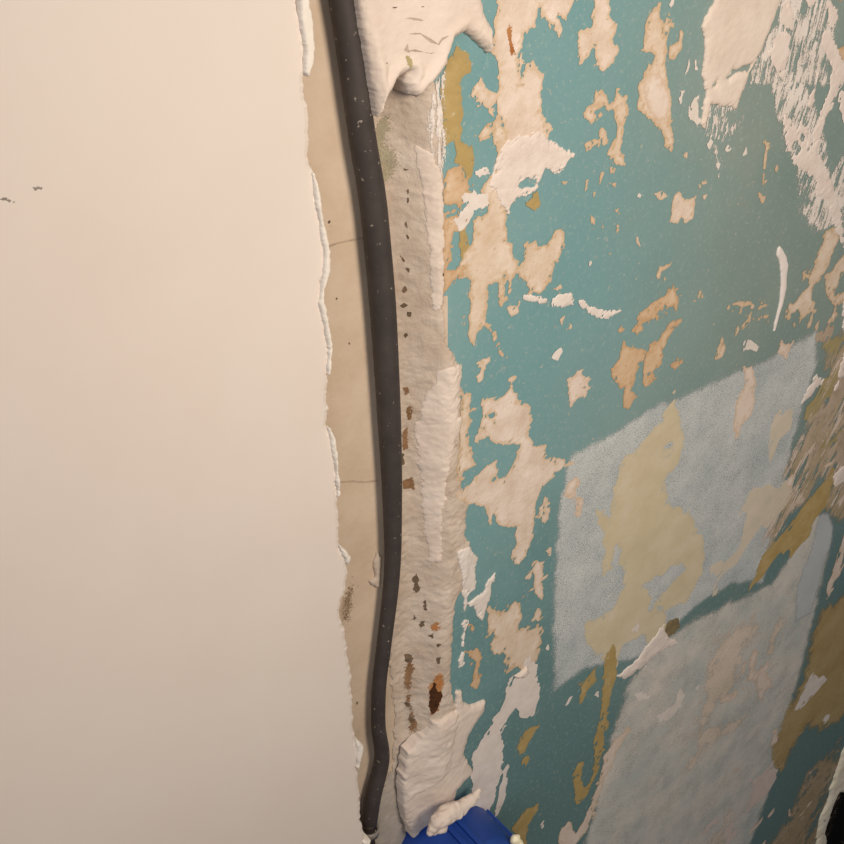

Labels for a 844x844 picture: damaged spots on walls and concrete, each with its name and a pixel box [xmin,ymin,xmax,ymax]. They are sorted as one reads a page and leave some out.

peeling [583,2,684,198]
peeling [758,139,778,203]
peeling [655,180,707,224]
rust [402,406,413,450]
rust [402,476,415,490]
peeling [558,227,844,844]
rust [404,662,418,735]
rust [427,673,444,715]
peeling [512,803,539,844]